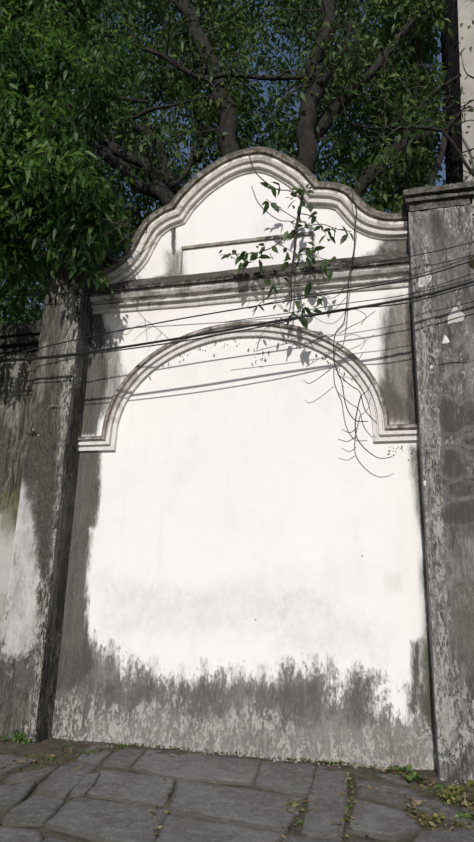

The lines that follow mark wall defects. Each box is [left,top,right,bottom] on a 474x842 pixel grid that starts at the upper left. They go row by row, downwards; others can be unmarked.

damp [370,233,409,262]
damp [0,353,25,489]
damp [23,283,77,615]
damp [82,314,120,435]
damp [380,299,418,424]
peeling [418,232,457,750]
damp [433,395,474,529]
peeling [447,307,465,324]
damp [52,445,437,771]